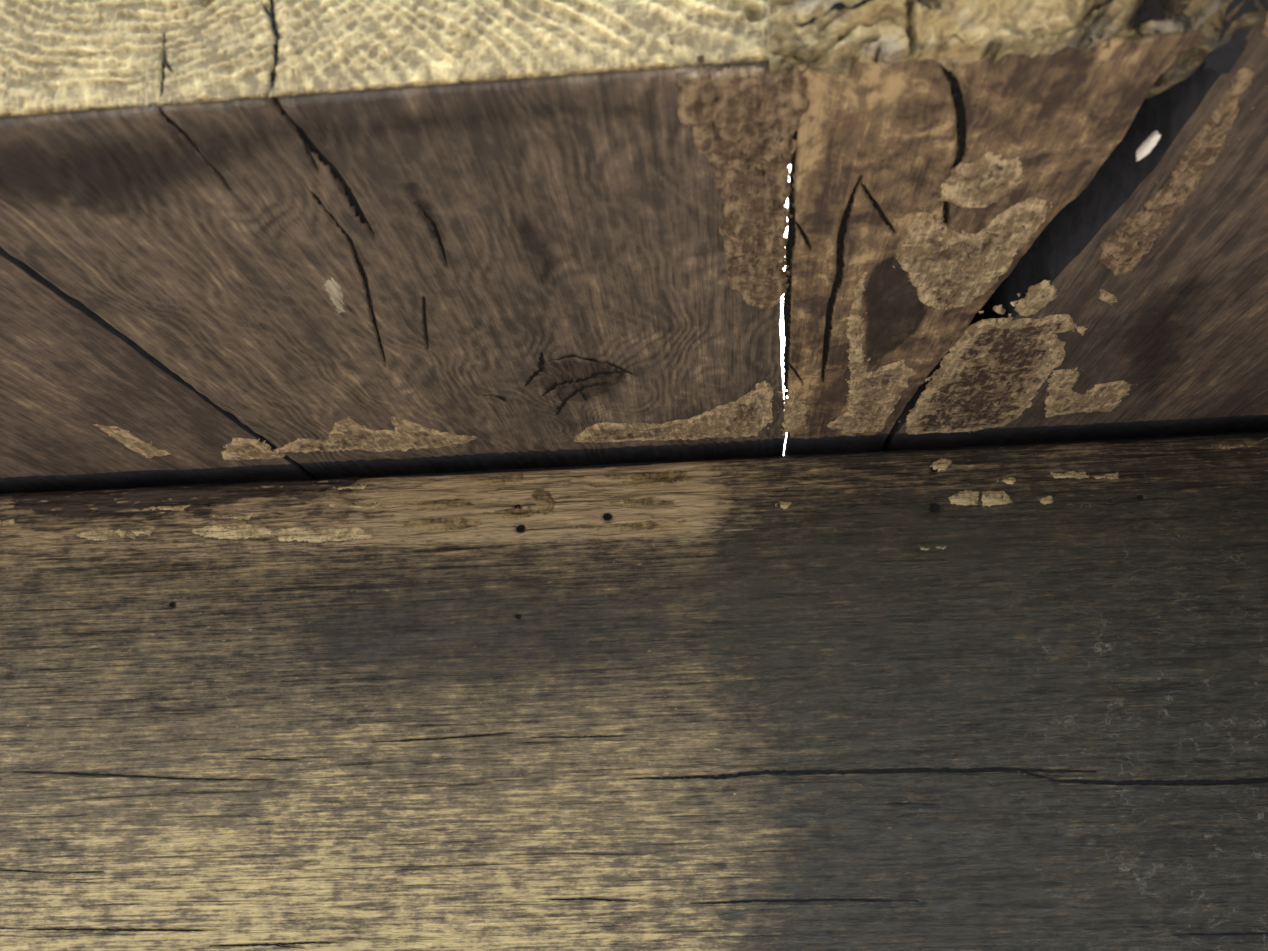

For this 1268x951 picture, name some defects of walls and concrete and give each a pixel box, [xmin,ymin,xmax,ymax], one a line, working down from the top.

crack [159,35,228,185]
crack [940,58,966,167]
crack [263,0,386,363]
peeling [674,54,816,309]
crack [783,161,895,403]
peeling [826,152,1137,435]
peeling [221,416,476,461]
peeling [574,380,812,443]
peeling [948,477,1016,507]
peeling [1051,471,1119,479]
crack [24,758,293,780]
crack [631,767,1268,786]